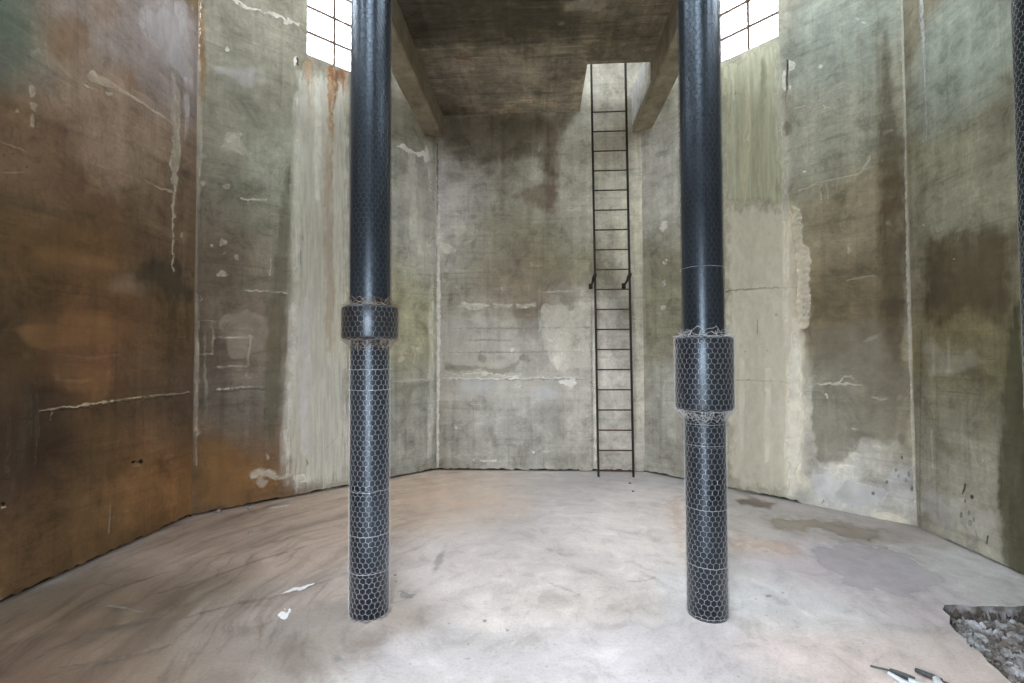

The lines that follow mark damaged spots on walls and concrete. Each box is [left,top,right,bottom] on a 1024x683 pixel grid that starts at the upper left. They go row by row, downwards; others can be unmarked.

leakage [142,89,192,299]
leakage [925,229,1009,325]
crack [40,391,189,411]